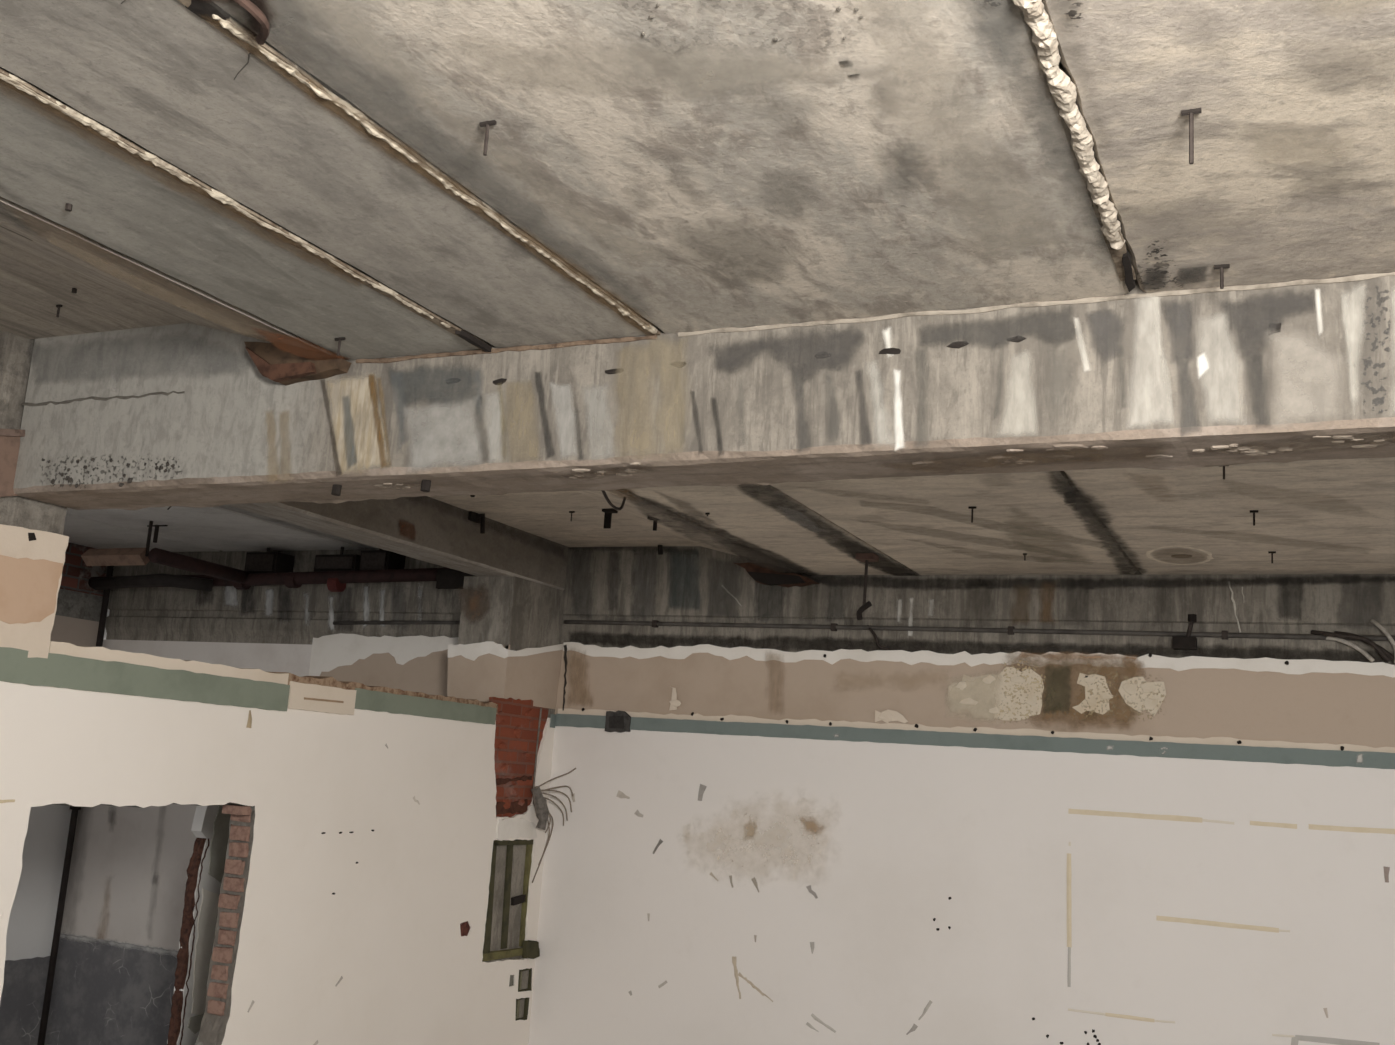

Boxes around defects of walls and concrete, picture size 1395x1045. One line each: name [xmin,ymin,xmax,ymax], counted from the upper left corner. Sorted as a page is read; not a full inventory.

rust [185,0,271,45]
rust [5,84,153,166]
rust [229,208,315,263]
rust [322,375,387,475]
leakage [717,331,903,450]
leakage [922,310,1121,371]
leakage [1130,241,1395,434]
leakage [562,471,1395,726]
flaking render [948,660,1046,732]
flaking render [1072,673,1166,717]
spalling [489,697,549,818]
spalling [60,804,255,1045]